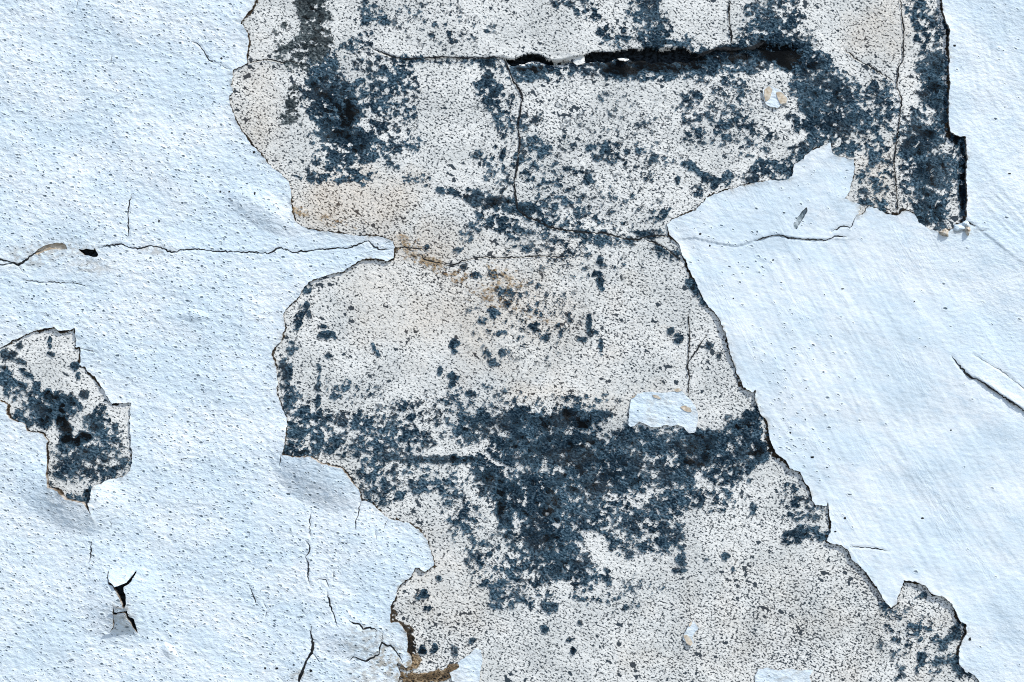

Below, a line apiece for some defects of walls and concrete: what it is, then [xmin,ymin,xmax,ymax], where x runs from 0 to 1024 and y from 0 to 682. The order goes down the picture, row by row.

crack [98,197,566,266]
crack [374,0,766,261]
water stain [271,0,967,367]
crack [756,217,856,241]
peeling [0,327,132,505]
water stain [0,341,132,503]
water stain [277,282,771,655]
peeling [229,0,979,682]
water stain [780,482,831,546]
crack [953,356,1024,411]